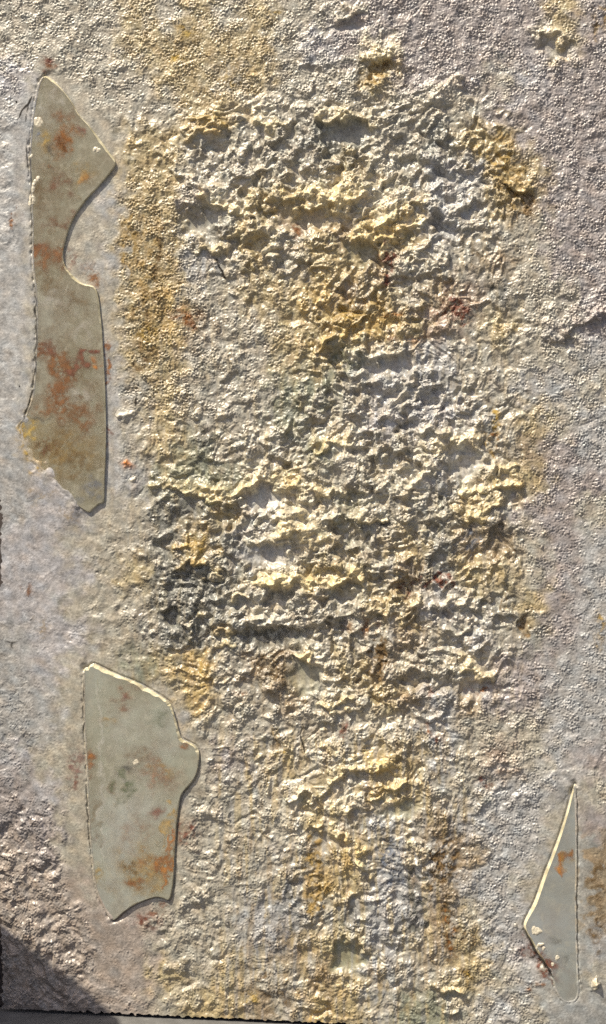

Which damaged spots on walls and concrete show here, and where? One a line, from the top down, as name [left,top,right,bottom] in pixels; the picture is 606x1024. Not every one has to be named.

flaking render [167,102,451,278]
rust [22,343,111,439]
flaking render [310,312,427,386]
flaking render [148,417,523,529]
flaking render [318,564,390,620]
peeling [428,590,479,638]
flaking render [237,608,424,823]
flaking render [457,653,503,702]
rust [124,801,194,889]
flaking render [280,786,375,883]
rust [557,850,573,875]
peeling [427,976,465,1018]